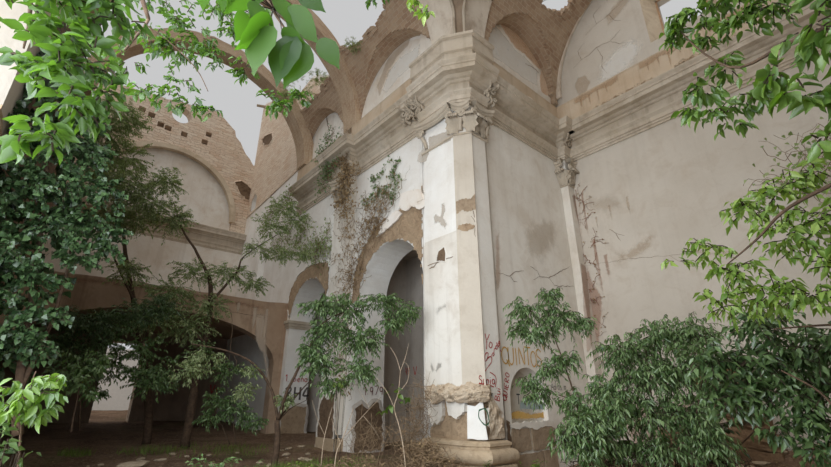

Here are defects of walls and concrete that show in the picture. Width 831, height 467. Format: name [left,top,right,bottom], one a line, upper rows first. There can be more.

flaking render [456,194,476,214]
flaking render [350,186,425,307]
flaking render [436,245,447,263]
crack [499,266,571,287]
flaking render [424,381,559,467]